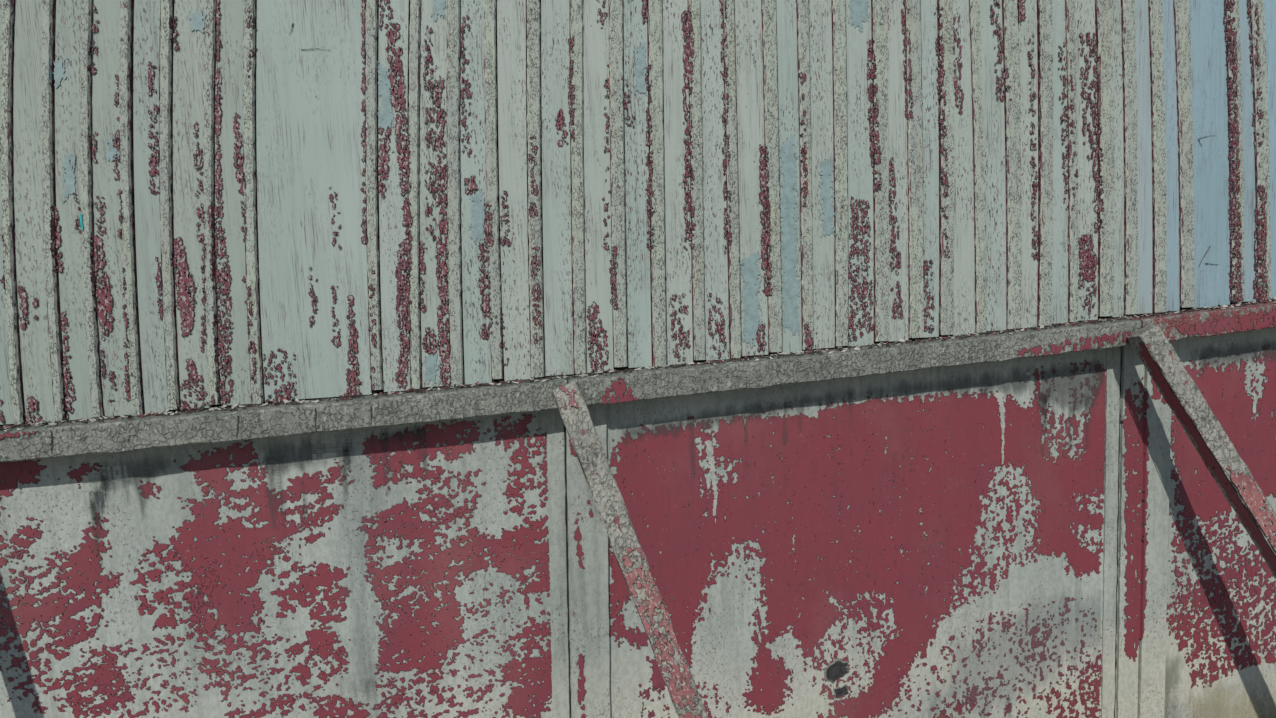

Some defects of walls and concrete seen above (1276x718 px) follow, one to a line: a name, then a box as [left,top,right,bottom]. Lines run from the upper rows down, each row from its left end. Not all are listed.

peeling [49,74,131,403]
peeling [155,0,297,411]
peeling [308,267,377,397]
peeling [360,0,472,389]
peeling [587,42,655,404]
peeling [681,10,696,250]
peeling [719,0,903,352]
peeling [923,6,964,334]
peeling [1058,32,1104,318]
peeling [1174,0,1276,336]
peeling [0,414,552,718]
peeling [574,331,1276,718]